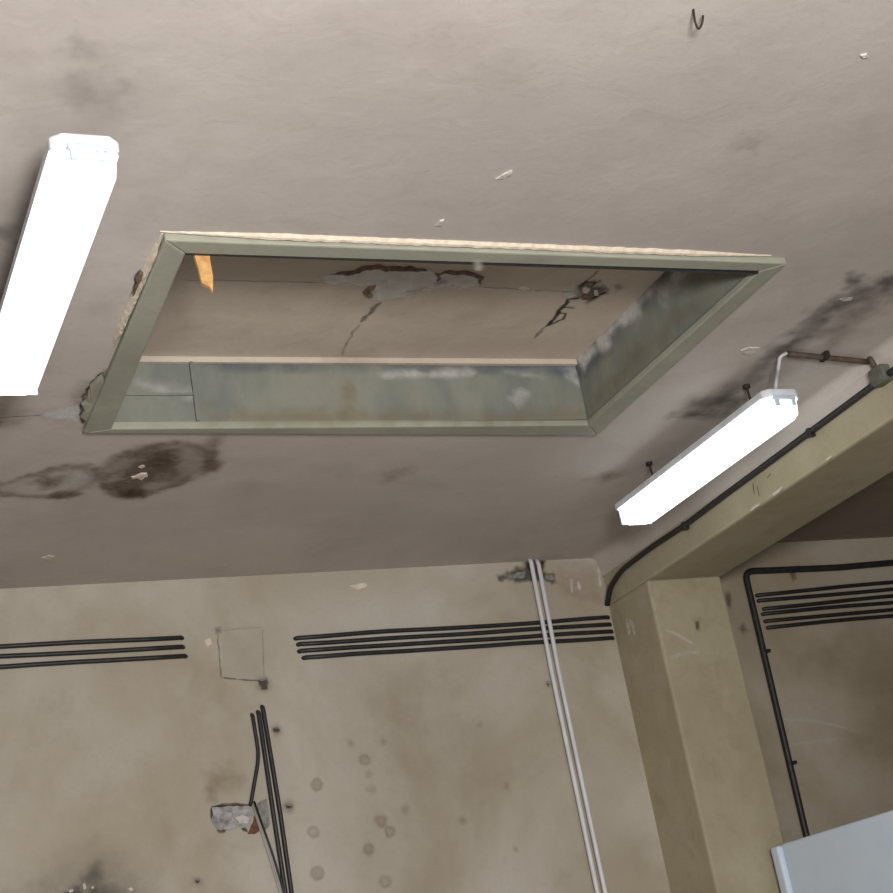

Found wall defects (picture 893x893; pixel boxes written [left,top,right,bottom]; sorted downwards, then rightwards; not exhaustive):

peeling [324,264,484,300]
water stain [124,457,159,495]